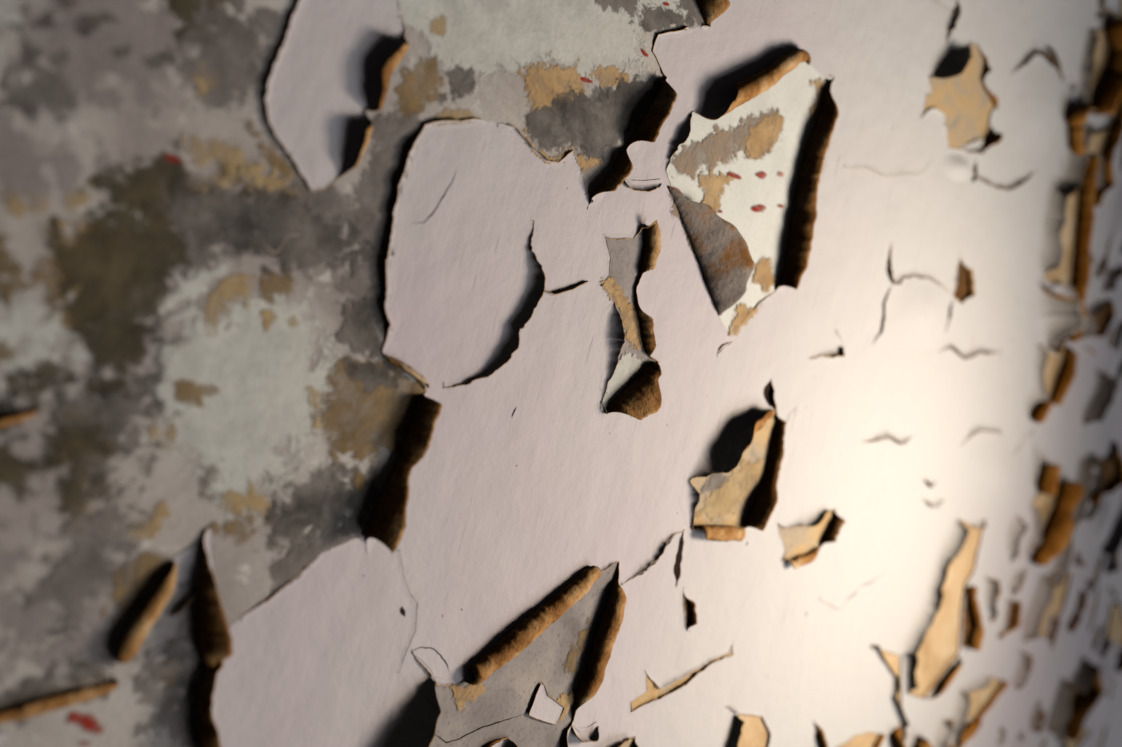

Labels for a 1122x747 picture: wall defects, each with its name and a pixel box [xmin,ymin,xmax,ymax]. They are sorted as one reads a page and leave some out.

flaking render [0,0,846,747]
peeling [918,39,1003,161]
peeling [950,255,975,309]
peeling [1030,0,1122,427]
peeling [805,442,1122,747]